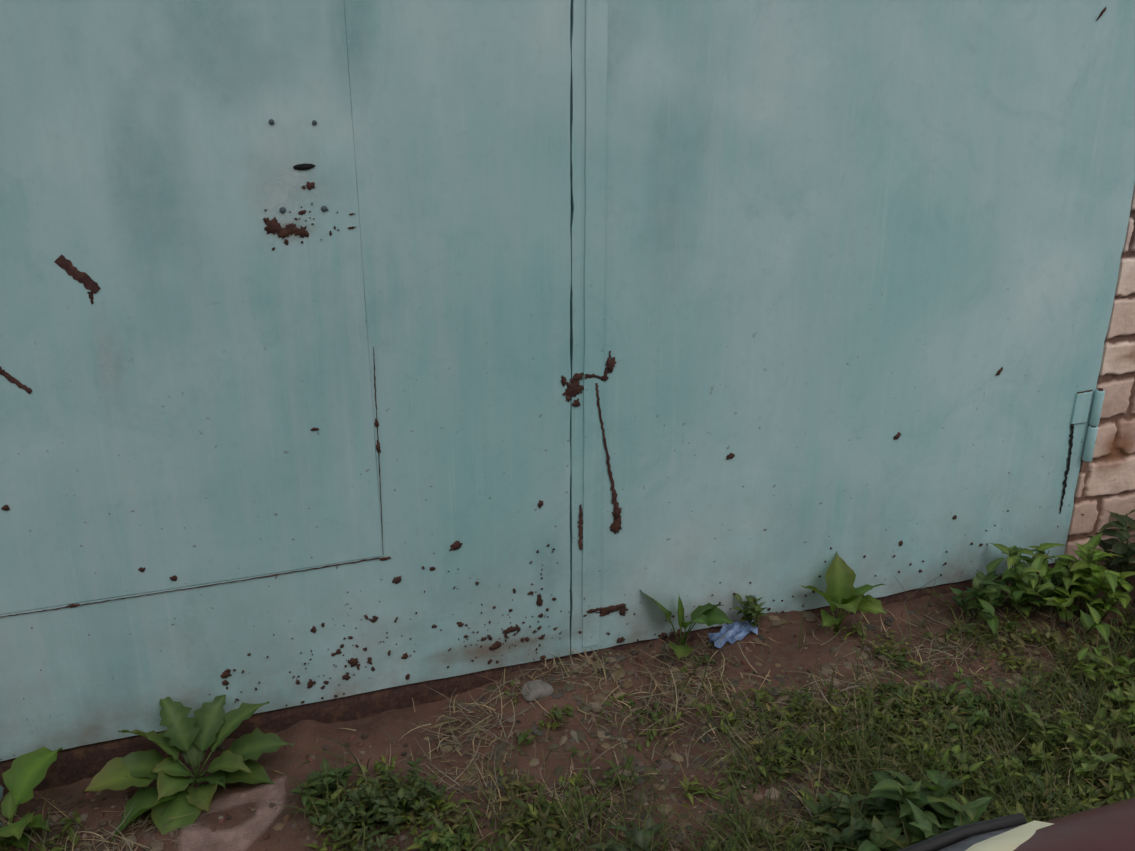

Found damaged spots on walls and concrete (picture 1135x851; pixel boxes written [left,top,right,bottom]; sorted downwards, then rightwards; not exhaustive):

corrosion [263,181,339,250]
corrosion [561,351,622,534]
corrosion [586,603,628,616]